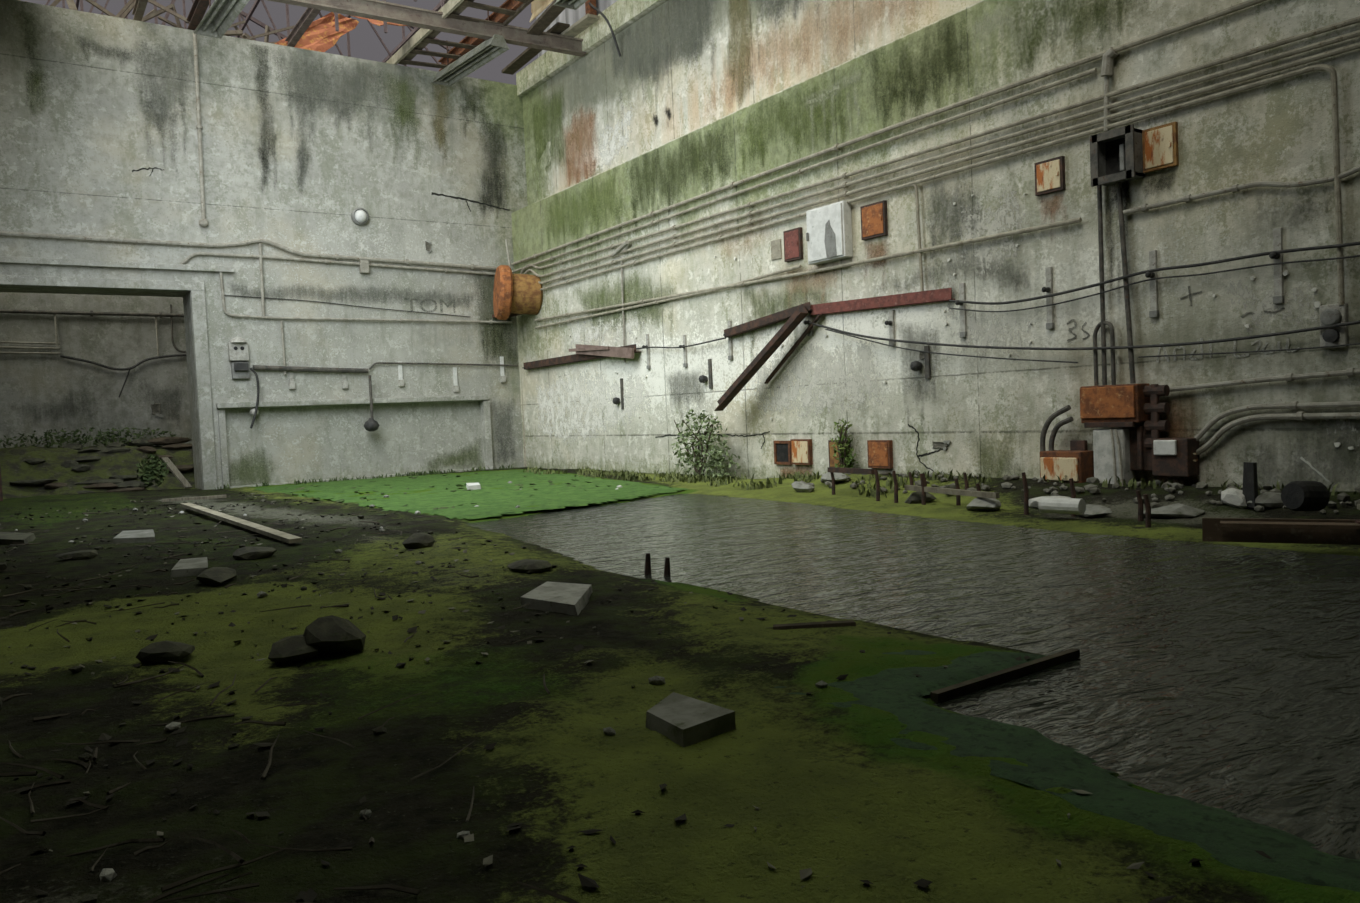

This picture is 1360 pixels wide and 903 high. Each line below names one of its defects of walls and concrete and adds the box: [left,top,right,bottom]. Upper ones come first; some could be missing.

water stain [258,50,271,172]
rust [565,115,594,182]